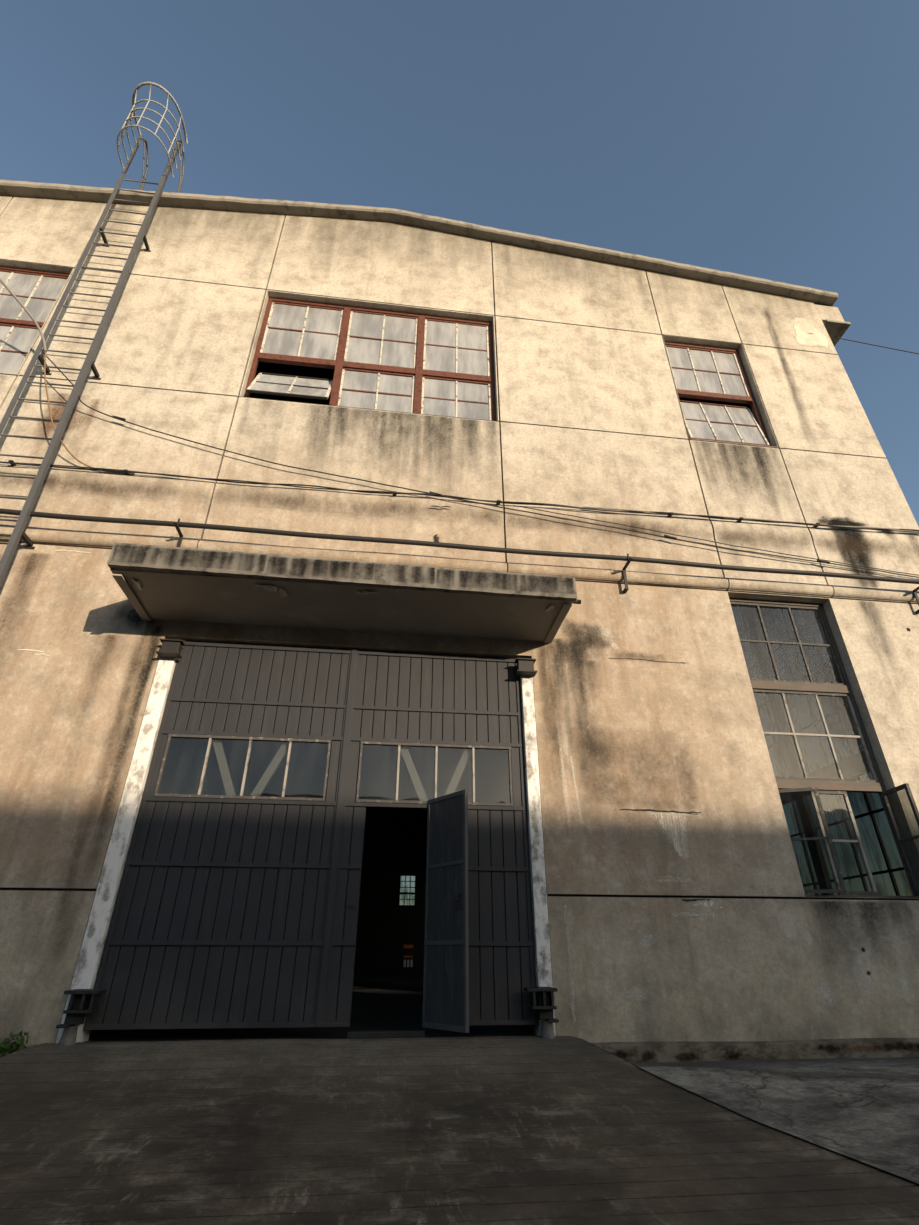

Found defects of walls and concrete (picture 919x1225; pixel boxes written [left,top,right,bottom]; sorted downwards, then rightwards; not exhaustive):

damp [722,445,769,485]
damp [821,517,875,586]
damp [541,624,617,700]